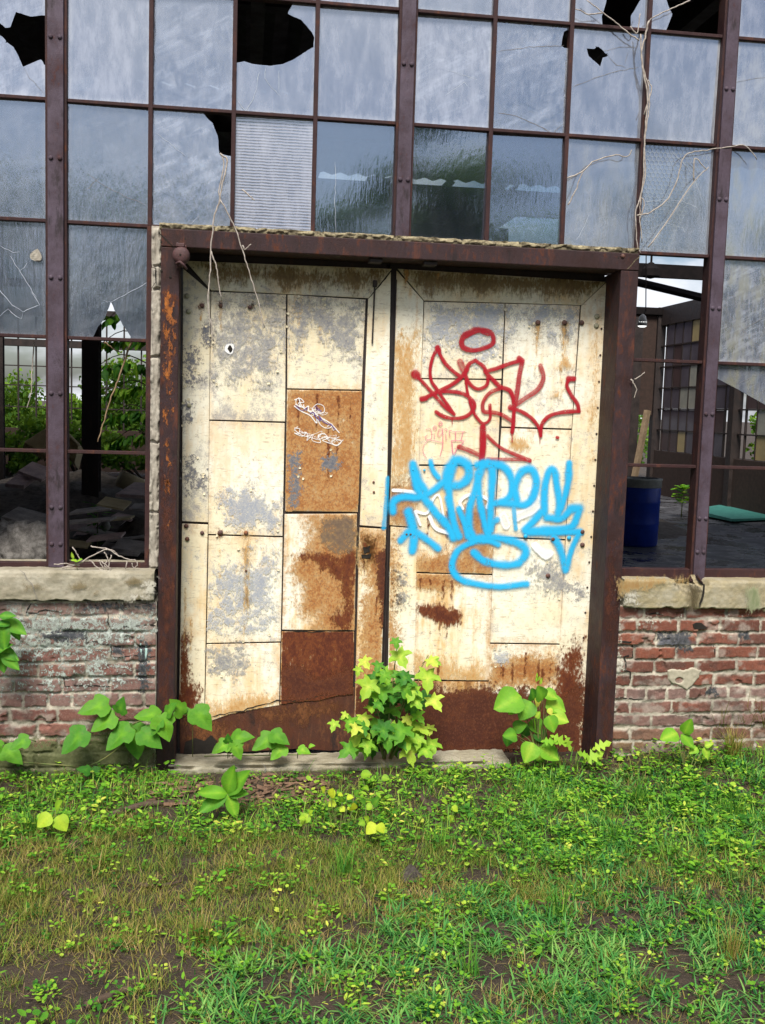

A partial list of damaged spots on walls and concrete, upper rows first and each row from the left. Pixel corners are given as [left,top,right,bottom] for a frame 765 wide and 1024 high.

rust [161,289,177,425]
rust [159,329,496,745]
rust [392,635,588,753]